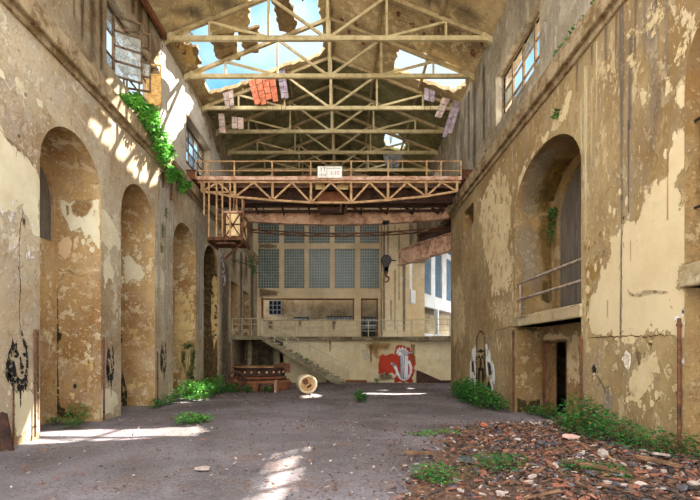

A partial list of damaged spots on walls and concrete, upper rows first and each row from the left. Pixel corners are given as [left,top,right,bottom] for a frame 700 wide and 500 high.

peeling [0,99,40,237]
peeling [479,87,574,329]
damp [576,6,635,269]
peeling [639,87,651,106]
peeling [626,0,669,39]
peeling [665,77,684,109]
peeling [674,19,691,66]
crack [590,231,672,343]
peeling [583,119,685,412]